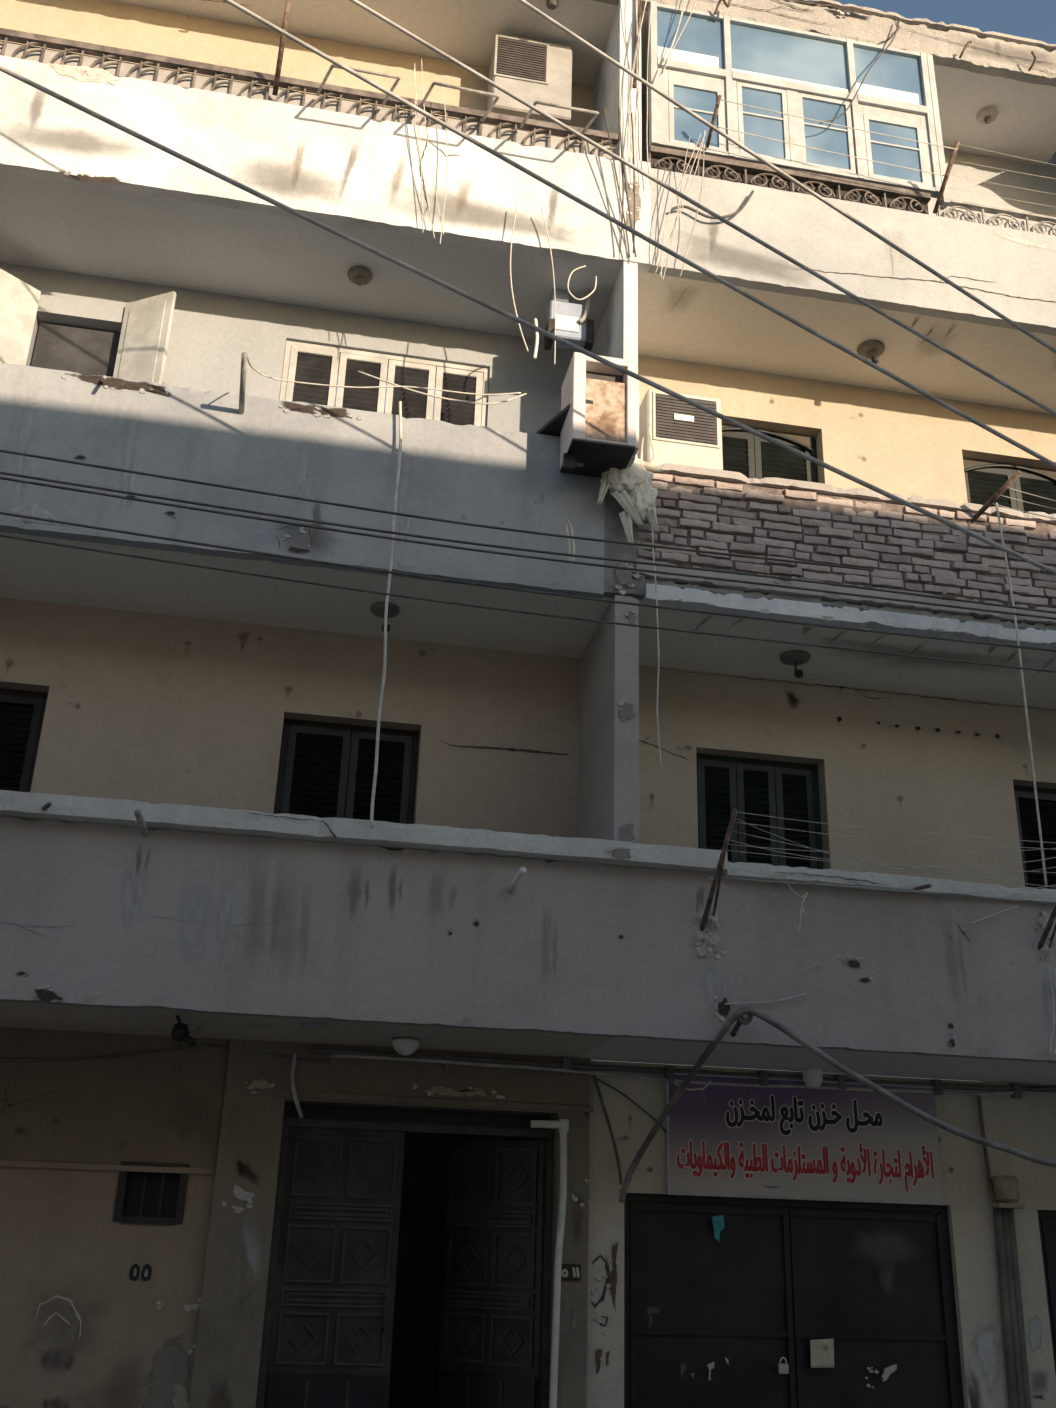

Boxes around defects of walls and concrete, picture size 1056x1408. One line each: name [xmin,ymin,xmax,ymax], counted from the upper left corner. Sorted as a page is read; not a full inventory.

leakage [442,201,524,228]
crack [812,269,1056,302]
peeling [8,504,67,526]
crack [440,739,569,755]
spalling [221,1184,255,1214]